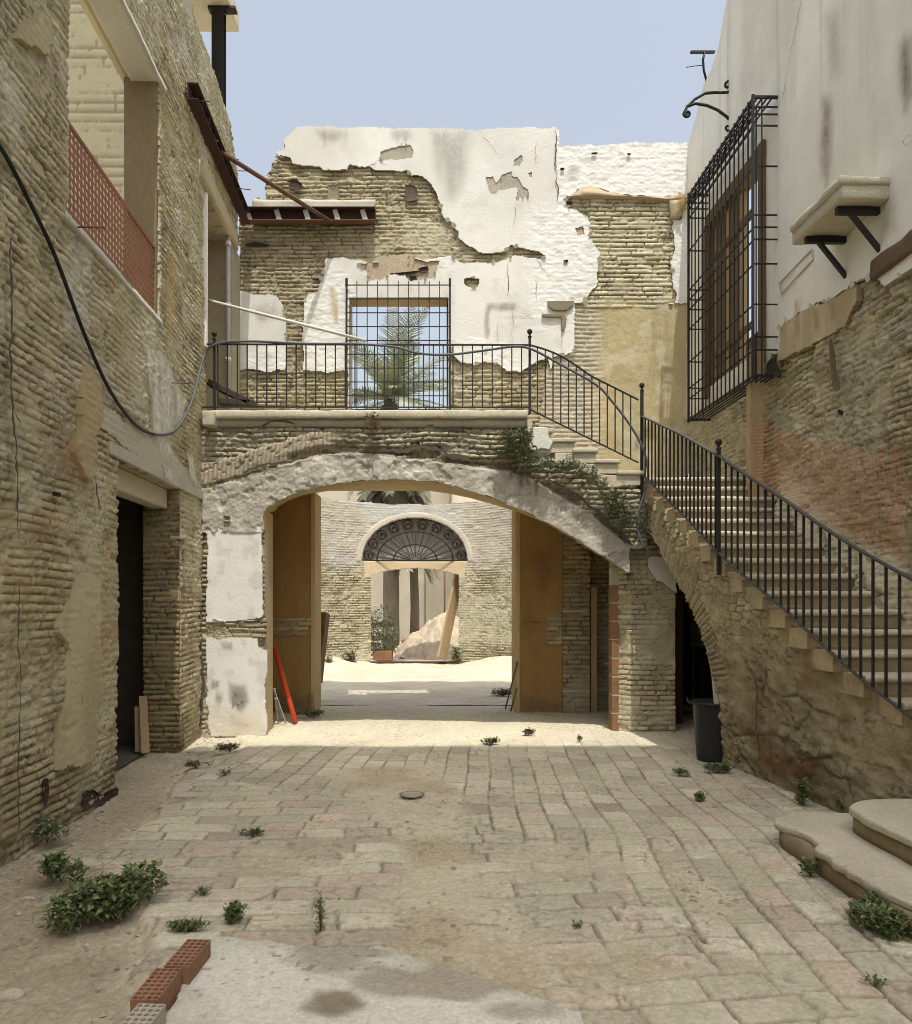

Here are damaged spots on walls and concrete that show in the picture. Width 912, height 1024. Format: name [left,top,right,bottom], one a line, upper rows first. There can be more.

crack [9,237,22,530]
peeling [239,143,546,411]
peeling [448,188,746,478]
peeling [764,272,912,629]
crack [13,578,26,829]
damp [212,681,247,708]
peeling [206,617,312,640]
peeling [688,604,706,649]
crack [743,671,769,762]
crack [793,746,858,783]